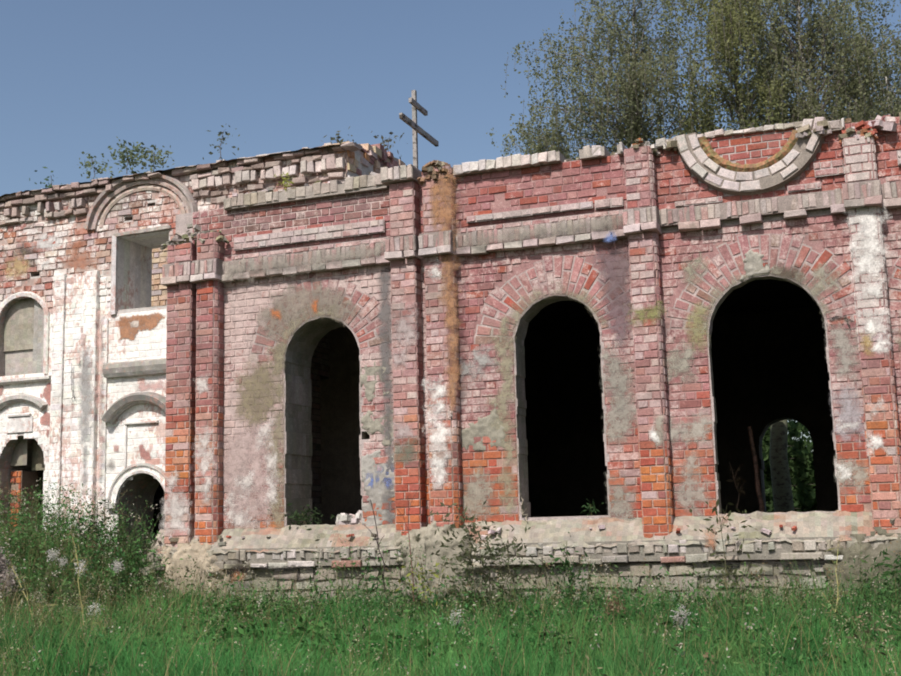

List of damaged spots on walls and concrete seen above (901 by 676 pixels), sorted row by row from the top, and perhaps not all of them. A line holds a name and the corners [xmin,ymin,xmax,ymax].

peeling [118,313,165,340]
leakage [236,362,276,424]
leakage [429,384,448,444]
leakage [432,456,446,485]